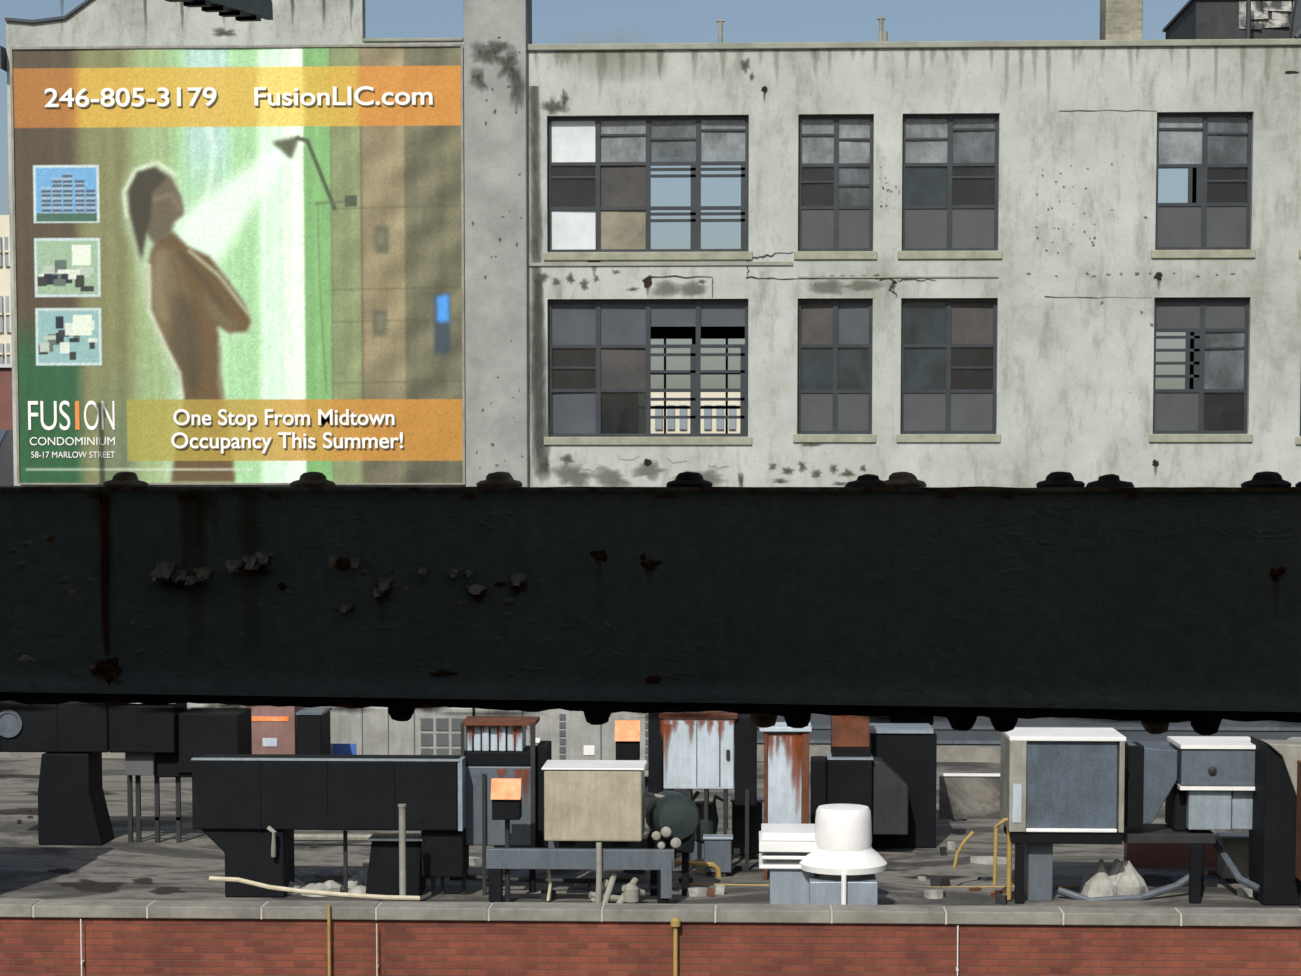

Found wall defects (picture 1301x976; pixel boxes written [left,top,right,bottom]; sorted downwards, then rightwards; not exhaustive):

water stain [472,37,547,474]
corrosion [87,493,126,709]
corrosion [0,703,46,711]
corrosion [149,702,255,713]
corrosion [329,702,366,712]
corrosion [406,703,529,717]
corrosion [651,712,734,750]